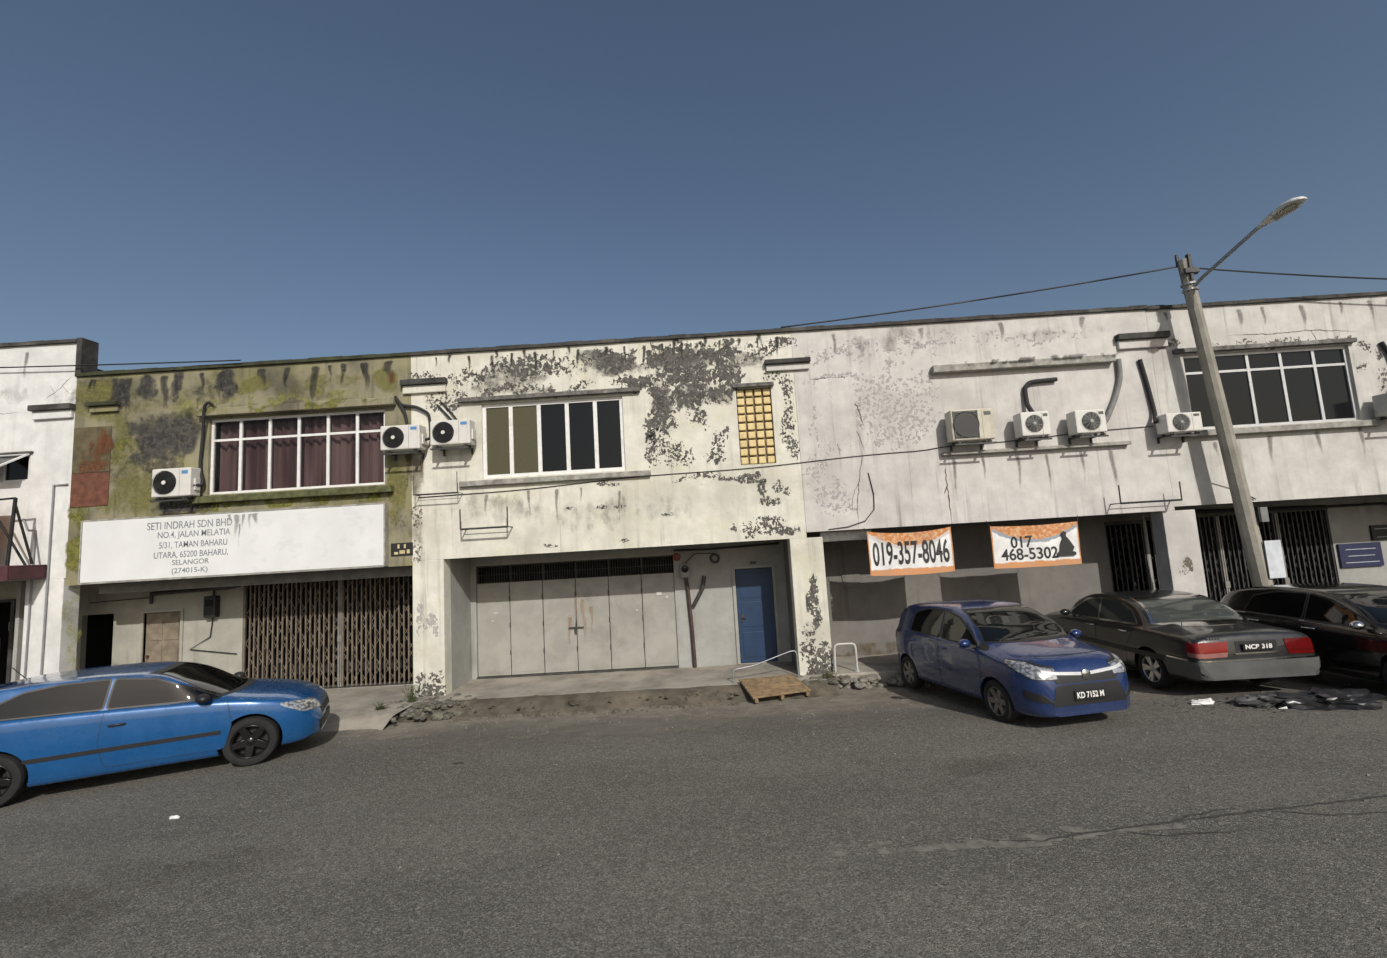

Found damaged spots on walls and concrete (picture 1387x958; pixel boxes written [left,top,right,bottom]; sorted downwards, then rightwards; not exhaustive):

leakage [89,368,237,472]
leakage [310,361,392,394]
peeling [405,330,1081,539]
crack [810,376,866,525]
flaking render [799,574,834,675]